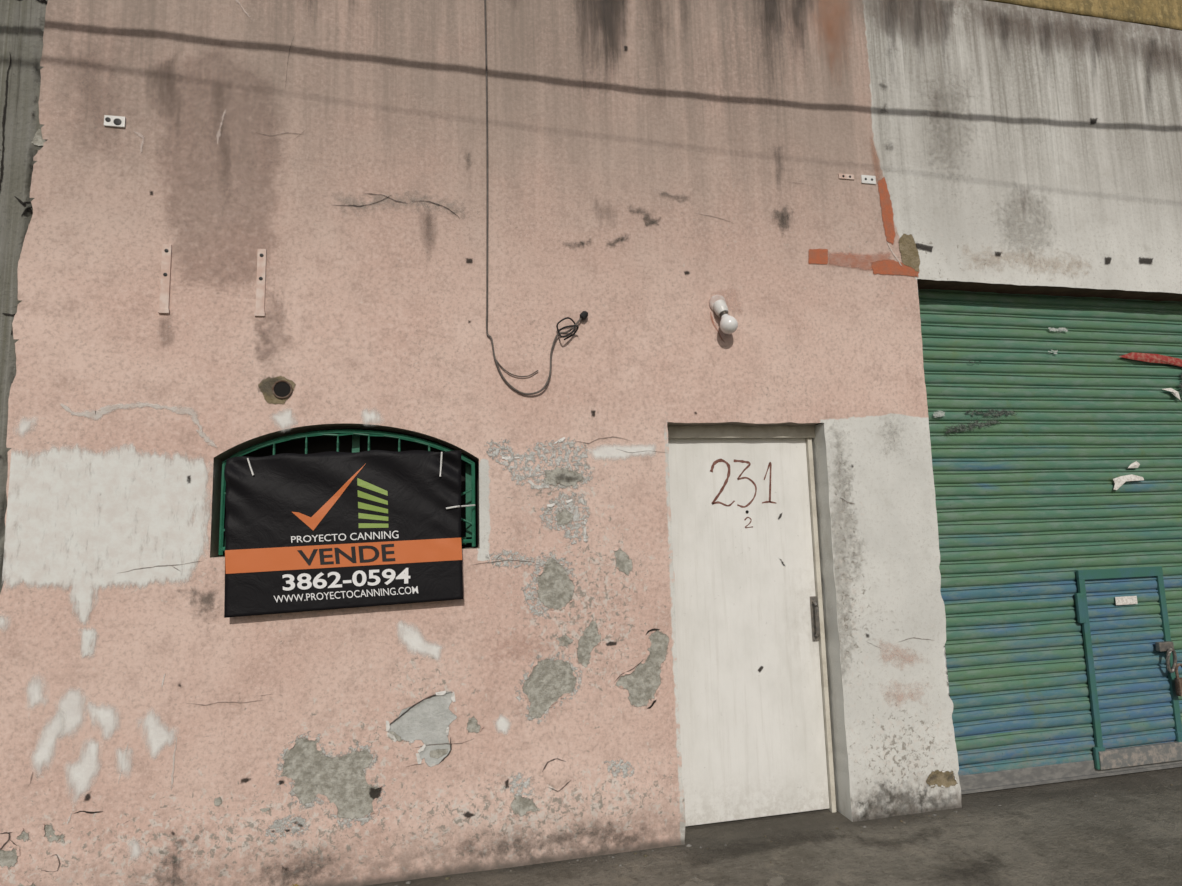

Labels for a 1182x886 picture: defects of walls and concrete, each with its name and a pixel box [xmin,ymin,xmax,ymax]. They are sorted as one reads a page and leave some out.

crack [340,193,459,217]
crack [60,402,217,448]
peeling [484,437,655,544]
spalling [486,549,576,619]
spalling [613,547,634,576]
peeling [398,622,441,660]
spalling [516,620,616,724]
spalling [616,628,669,710]
peeling [386,690,509,767]
spalling [260,733,386,842]
damp [869,791,944,812]
spalling [0,824,64,869]